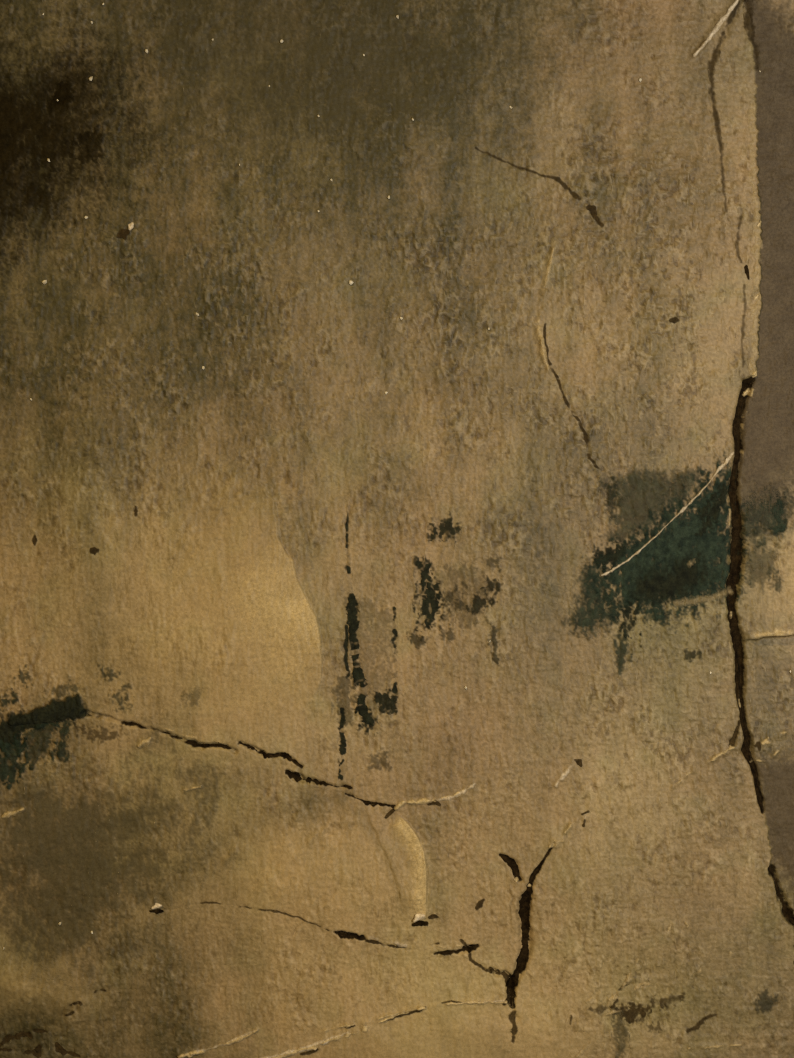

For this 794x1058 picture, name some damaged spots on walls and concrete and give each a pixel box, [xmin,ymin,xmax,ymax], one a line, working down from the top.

crack [709,0,758,190]
crack [476,148,604,227]
water stain [572,0,794,674]
water stain [428,518,460,541]
water stain [413,557,441,629]
water stain [472,579,500,614]
crack [726,376,764,813]
water stain [338,593,398,780]
water stain [0,692,88,789]
crack [122,721,474,818]
crack [247,811,589,1058]
crack [768,865,794,926]